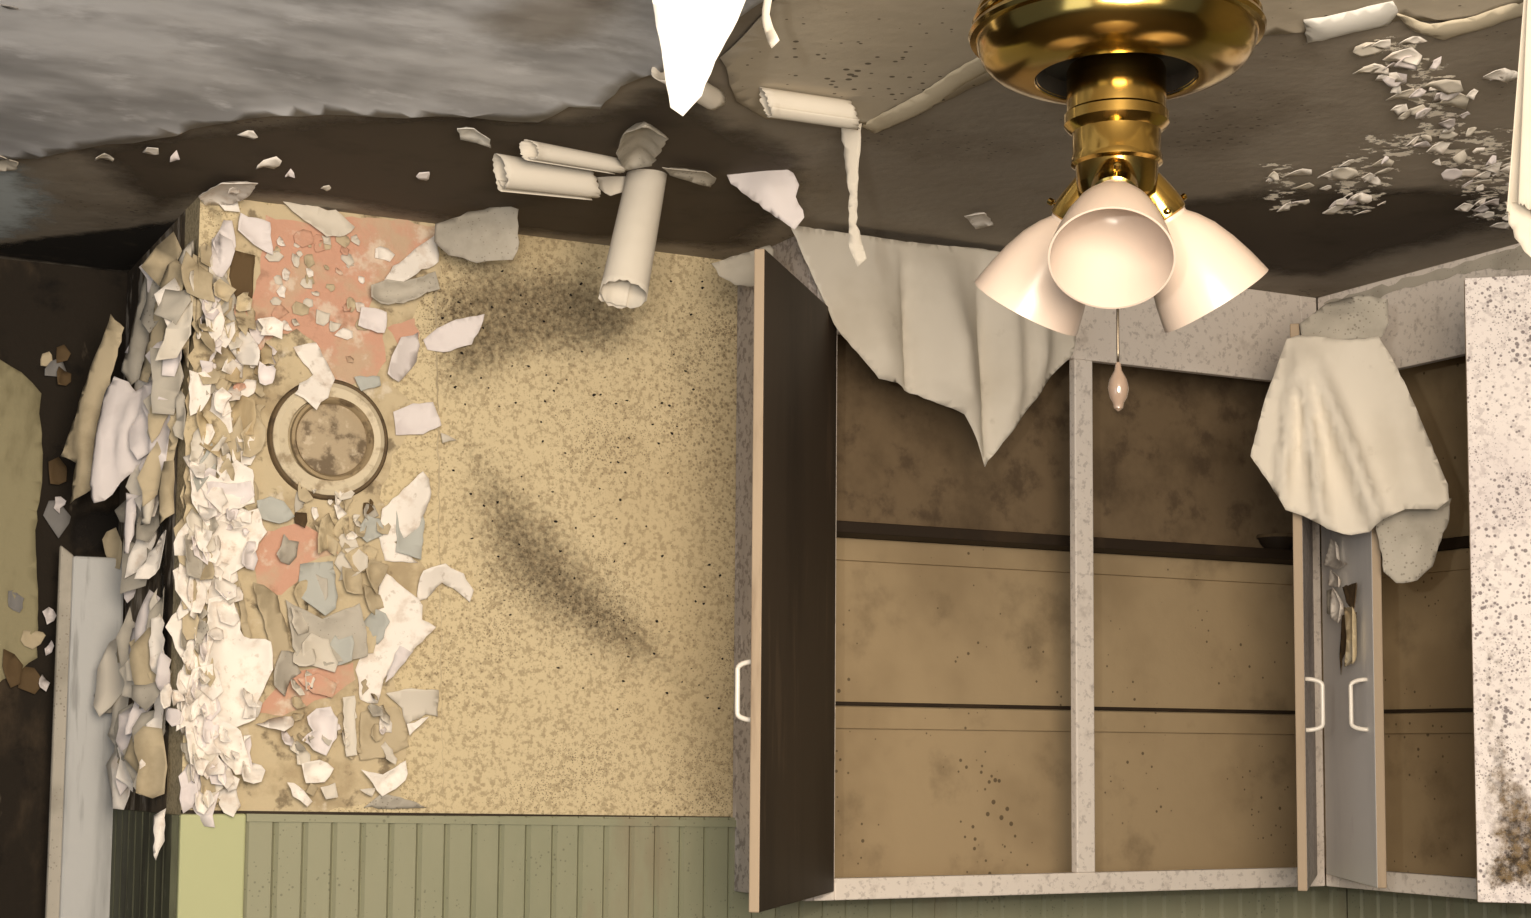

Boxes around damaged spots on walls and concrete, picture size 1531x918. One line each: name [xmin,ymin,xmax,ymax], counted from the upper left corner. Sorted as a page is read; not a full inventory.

peeling [143,147,180,162]
peeling [237,130,258,139]
peeling [616,122,716,187]
peeling [1259,36,1518,229]
peeling [964,212,994,229]
flaking render [176,156,484,817]
leakage [1491,766,1531,884]